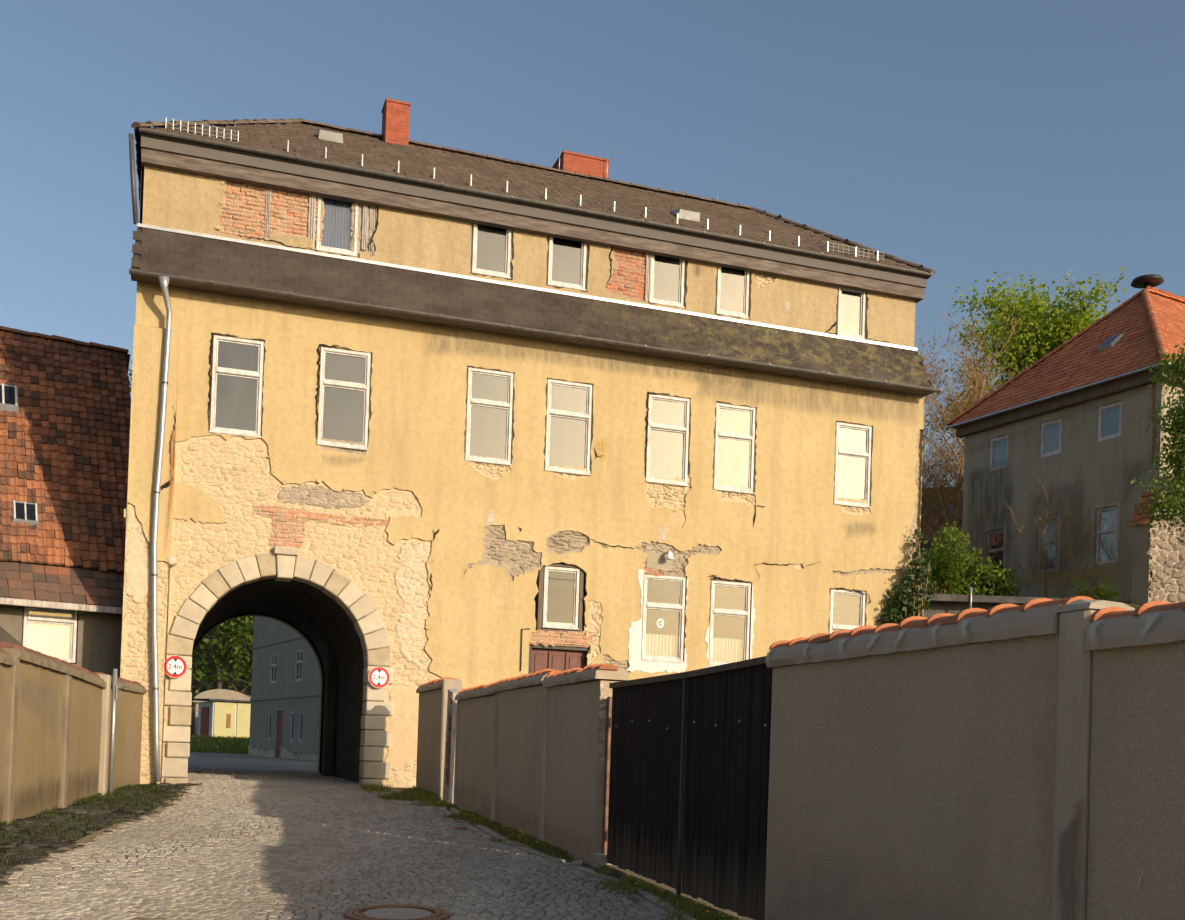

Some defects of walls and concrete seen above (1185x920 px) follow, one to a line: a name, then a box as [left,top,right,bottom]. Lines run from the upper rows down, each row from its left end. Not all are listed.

flaking render [215,180,325,242]
flaking render [604,248,653,304]
peeling [471,456,511,479]
peeling [645,474,691,527]
peeling [467,525,590,581]
crack [708,562,818,582]
peeling [121,433,442,788]